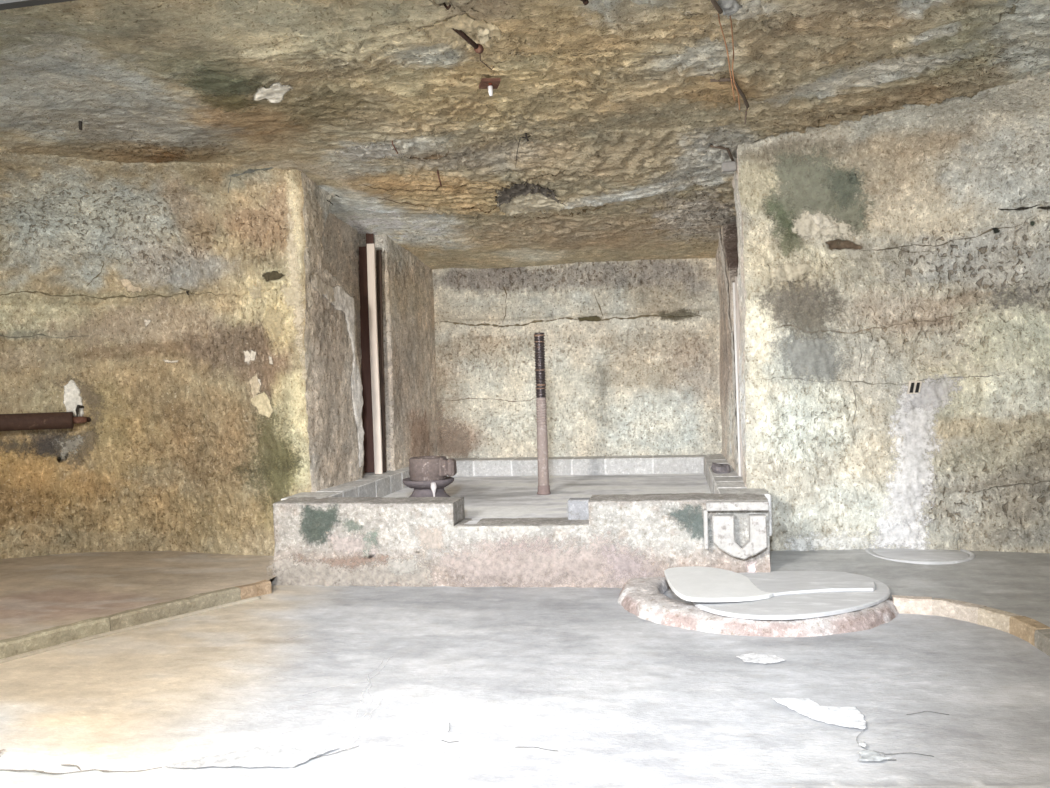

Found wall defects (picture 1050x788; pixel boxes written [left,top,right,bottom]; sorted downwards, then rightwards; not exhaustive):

leakage [201,83,292,113]
spalling [496,182,564,216]
leakage [767,199,803,256]
crack [861,205,1050,253]
crack [0,262,223,300]
crack [435,287,702,327]
flaking render [249,211,365,467]
spalling [772,698,892,761]
crack [1,764,162,774]